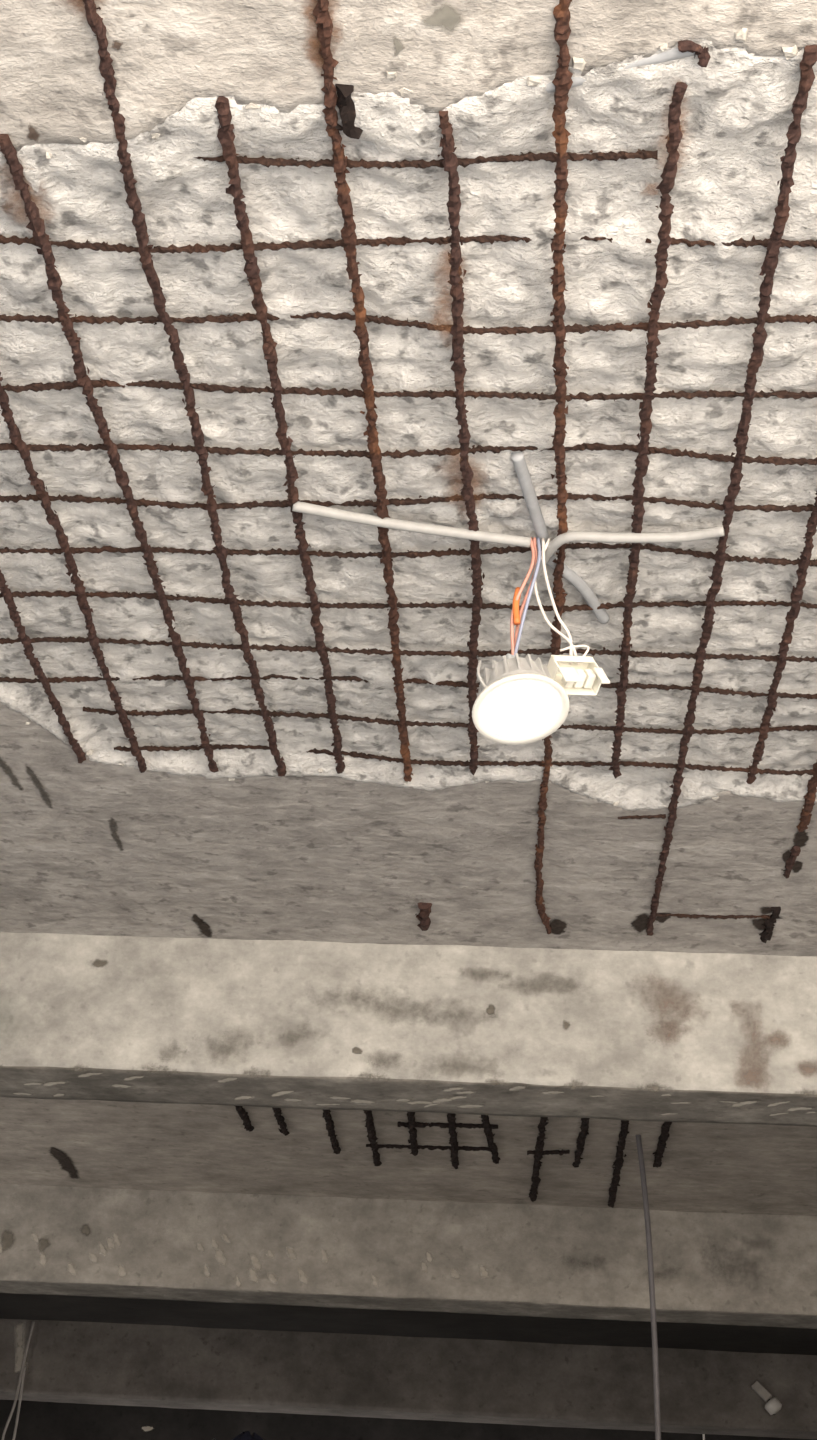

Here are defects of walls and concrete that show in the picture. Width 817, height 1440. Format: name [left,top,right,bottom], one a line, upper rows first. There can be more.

corrosion [435,254,461,335]
spalling [0,0,817,943]
corrosion [449,454,479,511]
spalling [235,1106,254,1132]
spalling [272,1108,290,1136]
spalling [322,1110,341,1154]
spalling [363,1110,501,1169]
spalling [527,1117,590,1202]
spalling [608,1120,629,1208]
spalling [652,1122,672,1168]